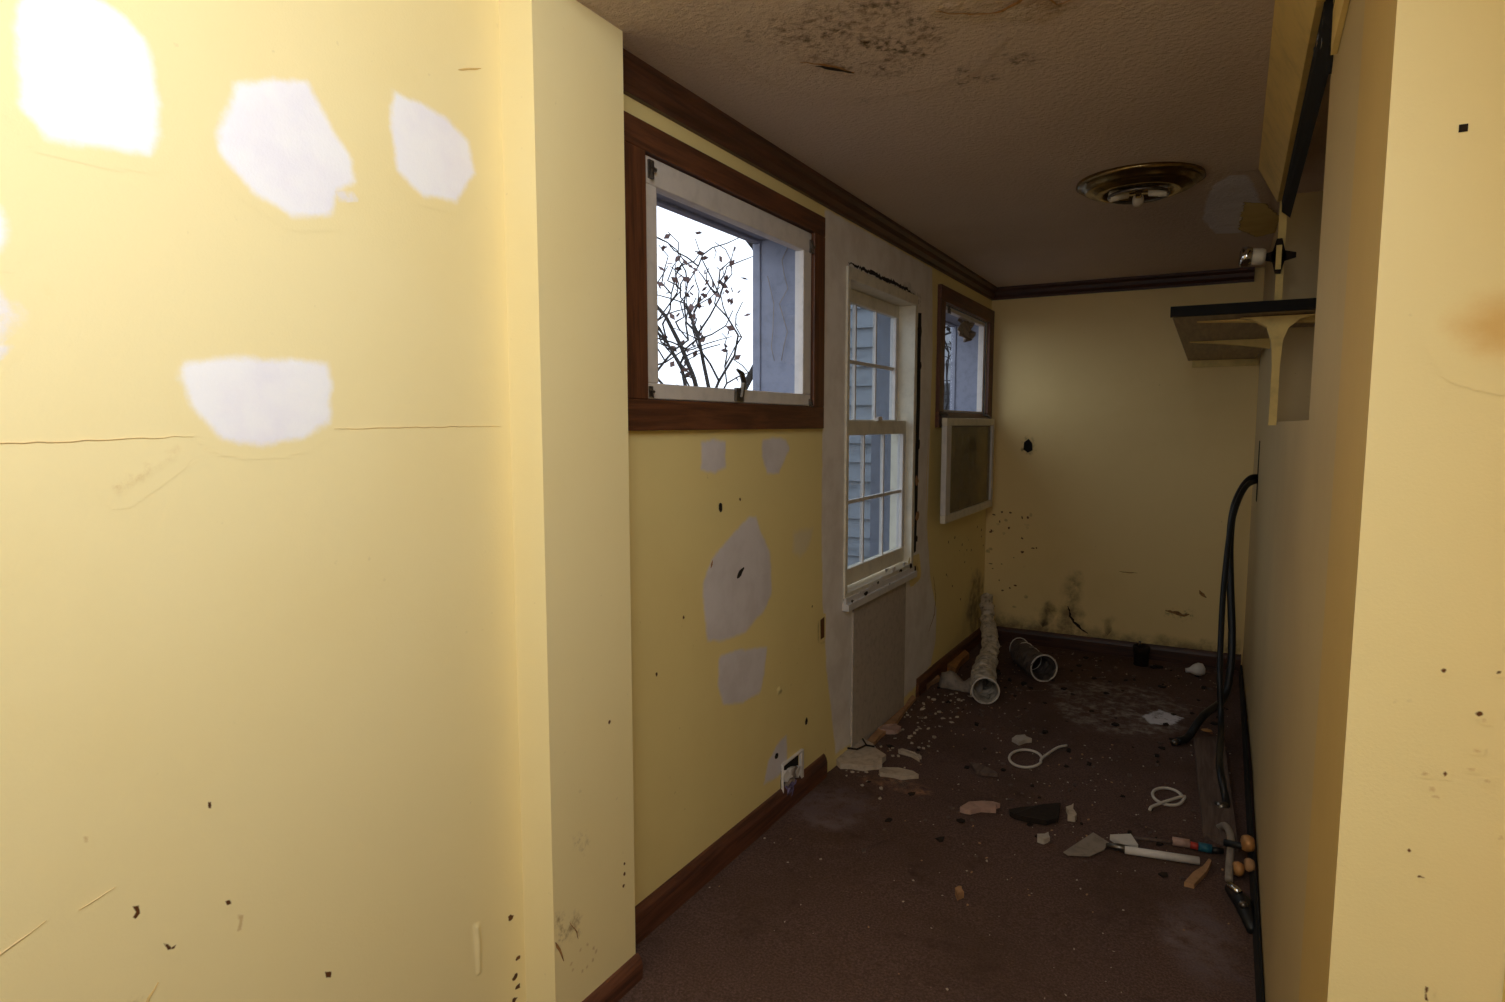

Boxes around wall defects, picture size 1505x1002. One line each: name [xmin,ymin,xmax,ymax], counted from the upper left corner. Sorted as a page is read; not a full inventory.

leakage [701,0,1027,99]
leakage [965,510,1038,637]